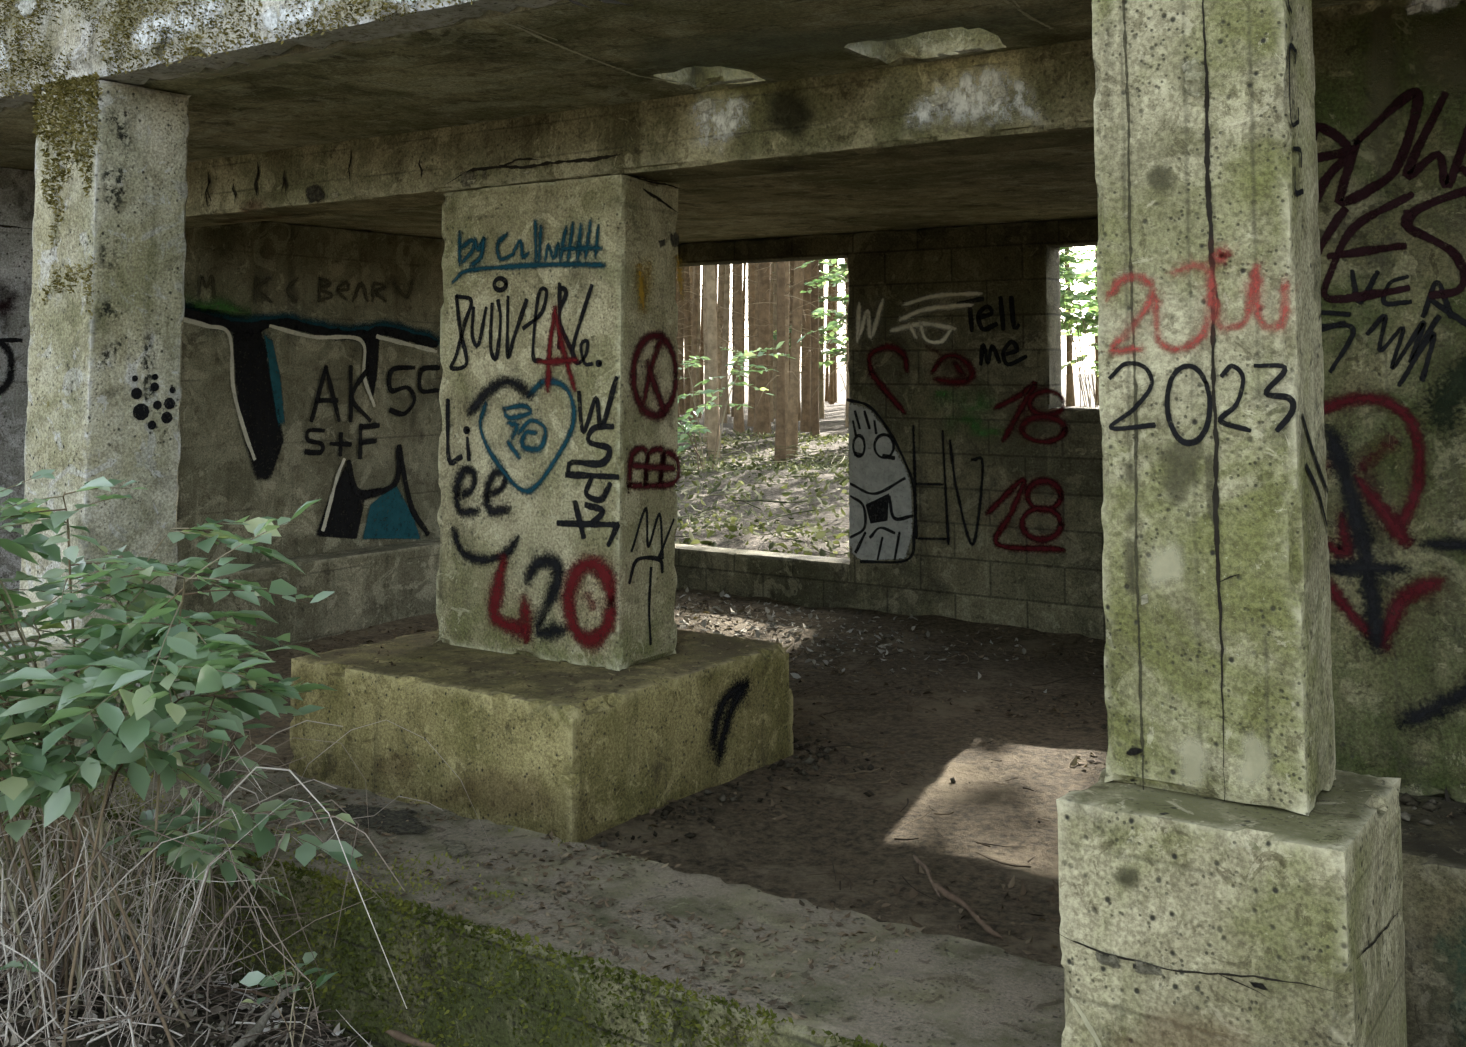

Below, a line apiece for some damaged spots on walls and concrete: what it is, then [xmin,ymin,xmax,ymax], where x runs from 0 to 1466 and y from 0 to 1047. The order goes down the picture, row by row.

crack [418,153,684,212]
crack [1202,0,1239,801]
crack [1052,931,1343,998]
crack [1357,914,1397,959]